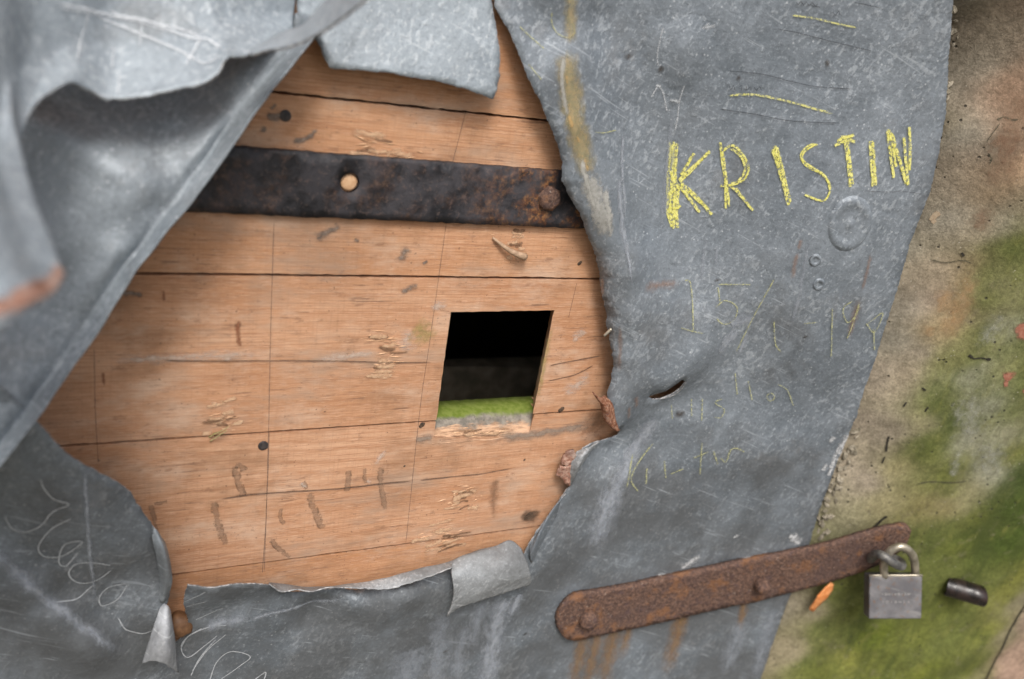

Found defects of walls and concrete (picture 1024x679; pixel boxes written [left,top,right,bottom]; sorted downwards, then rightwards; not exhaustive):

peeling [349,129,411,158]
peeling [366,335,406,379]
peeling [202,396,243,436]
efflorescence [821,435,849,475]
peeling [411,532,470,552]